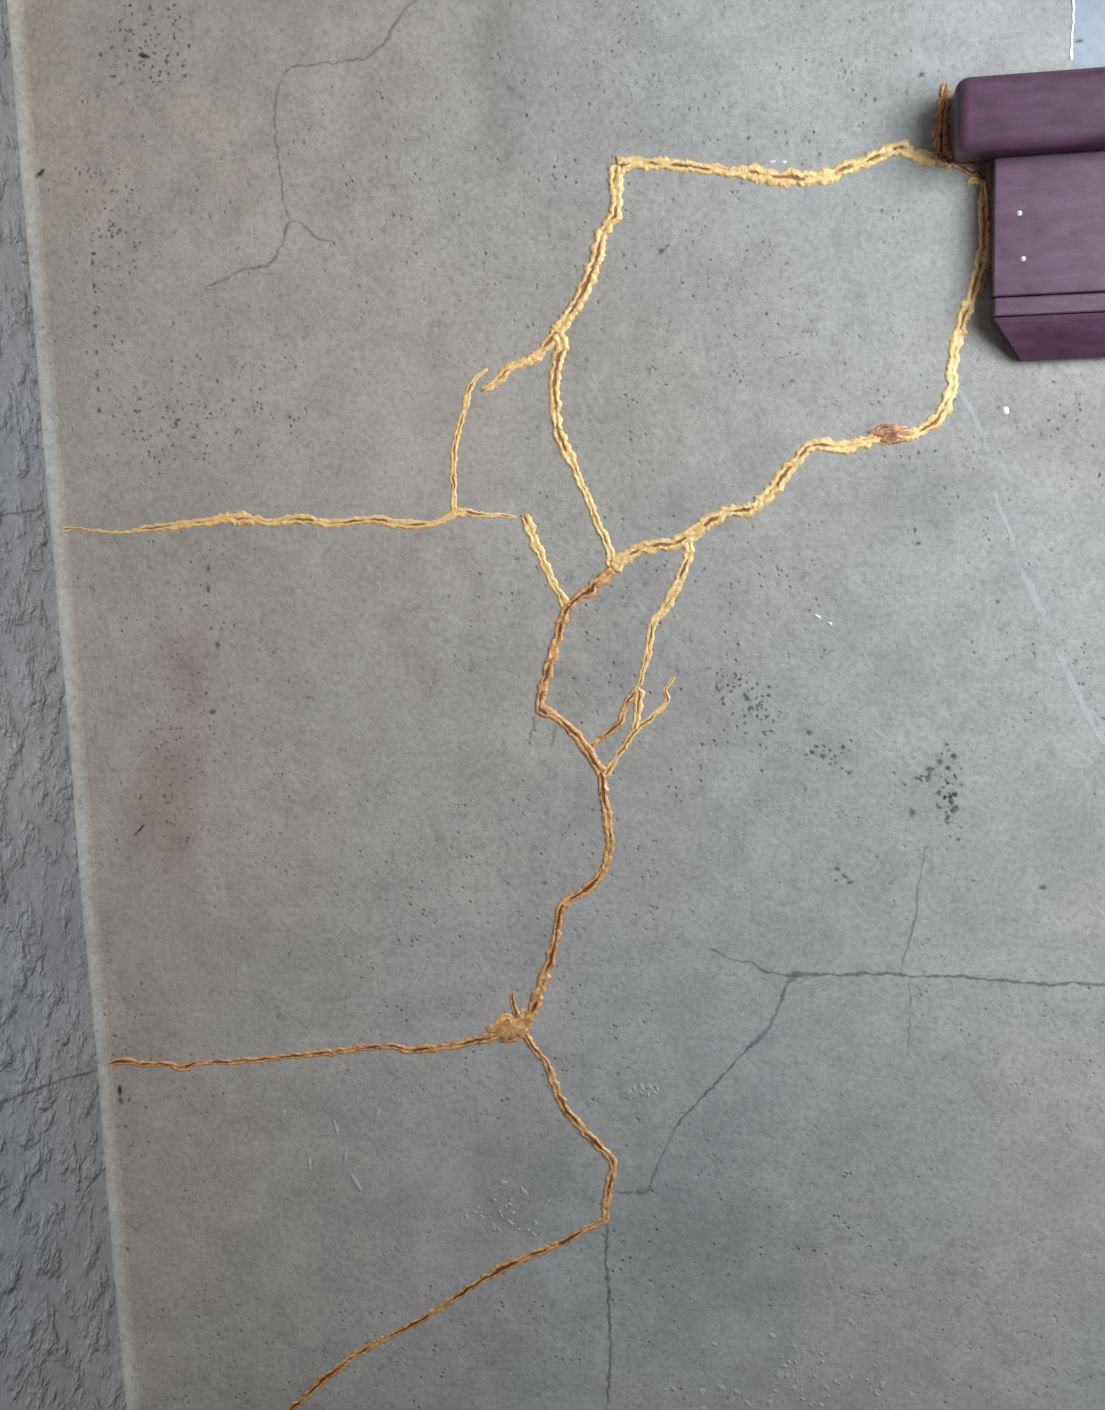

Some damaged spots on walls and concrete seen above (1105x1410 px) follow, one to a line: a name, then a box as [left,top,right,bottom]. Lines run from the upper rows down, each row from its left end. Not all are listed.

crack [63,83,991,1410]